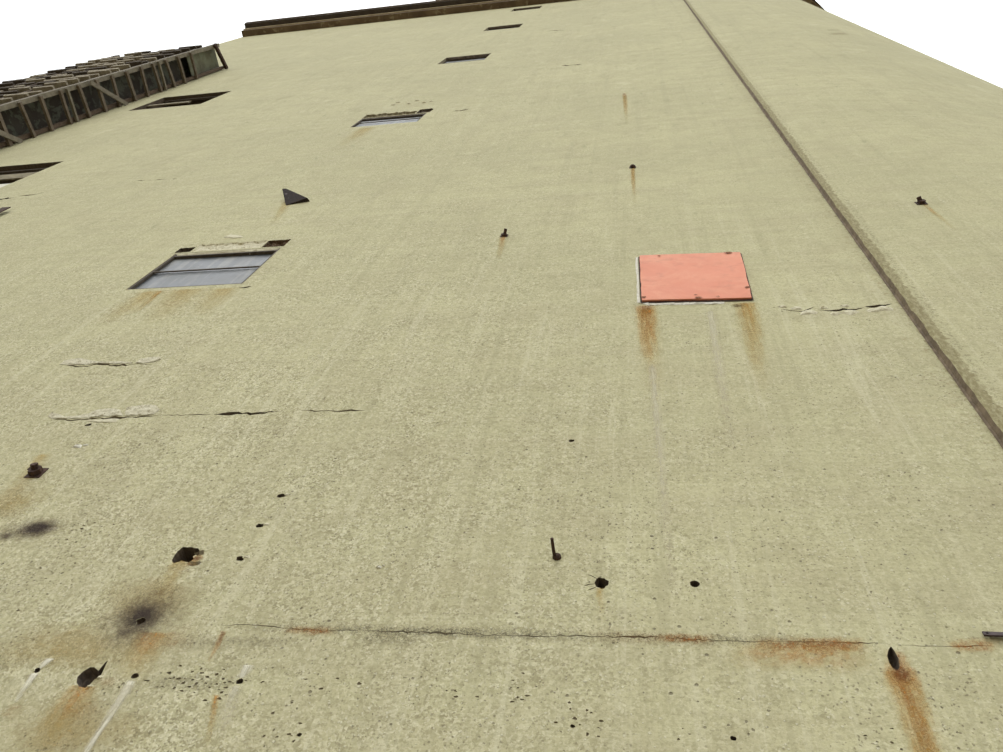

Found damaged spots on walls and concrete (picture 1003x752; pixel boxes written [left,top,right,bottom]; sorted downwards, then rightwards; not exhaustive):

crack [778,304,893,316]
spalling [48,405,160,426]
crack [50,411,277,421]
crack [309,406,365,414]
spalling [172,547,205,566]
crack [225,624,884,644]